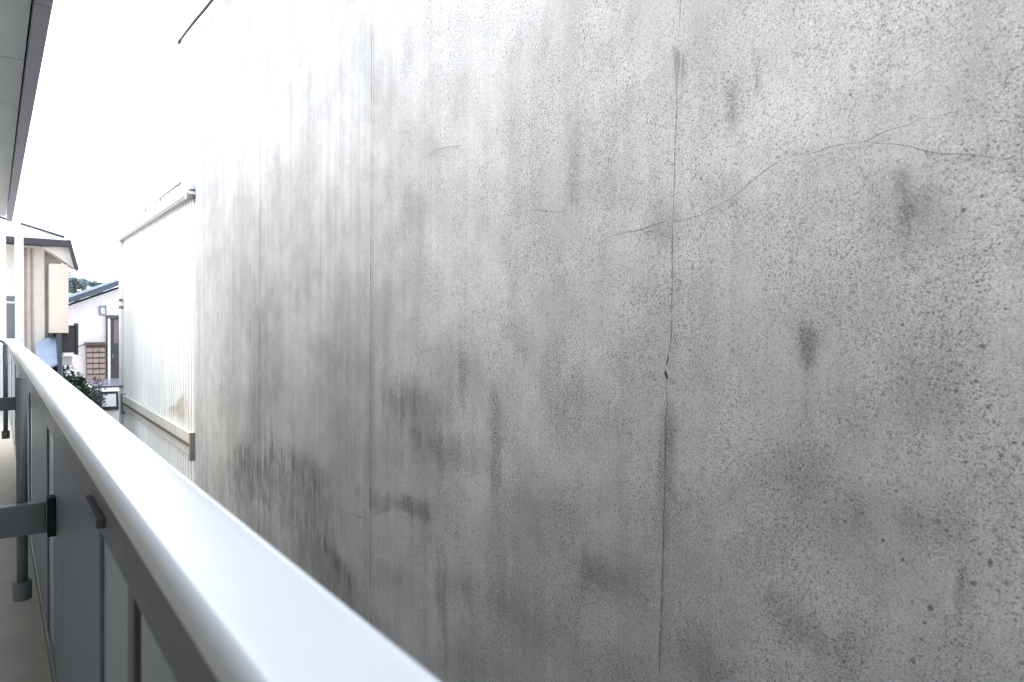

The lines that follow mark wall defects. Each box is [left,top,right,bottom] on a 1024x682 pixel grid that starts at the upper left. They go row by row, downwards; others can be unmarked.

crack [672,158,768,255]
crack [662,384,670,462]
crack [658,490,666,672]